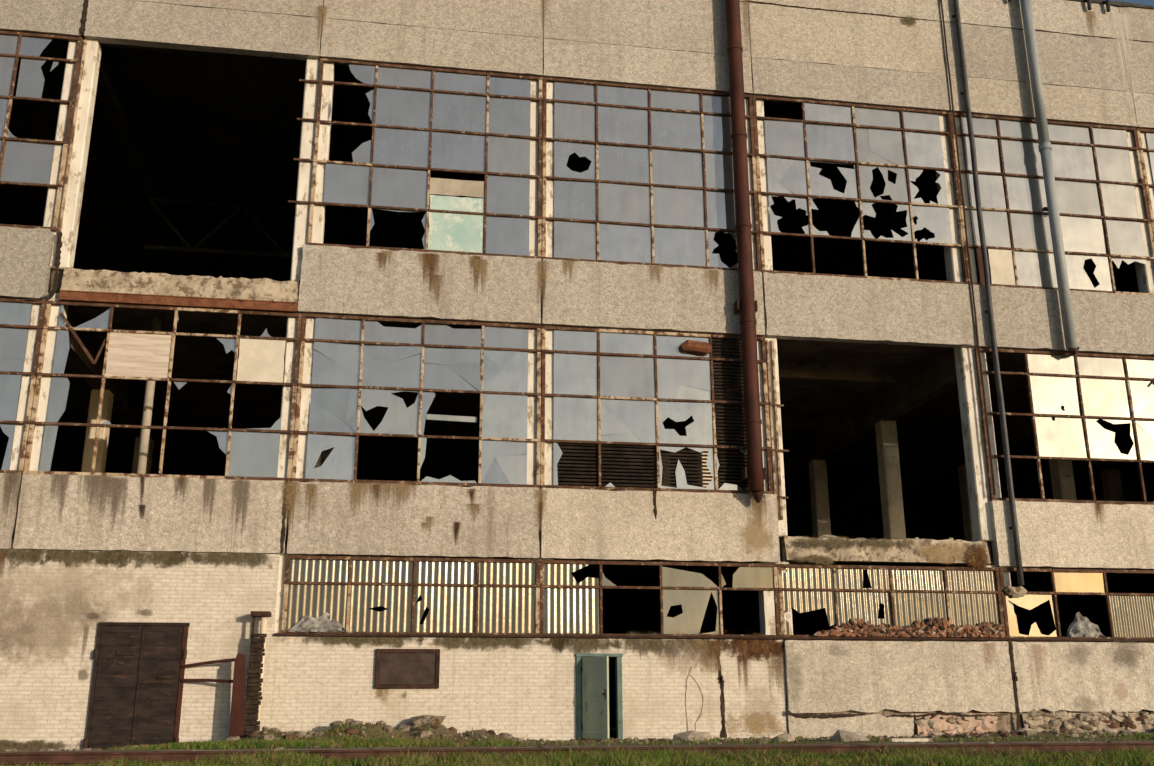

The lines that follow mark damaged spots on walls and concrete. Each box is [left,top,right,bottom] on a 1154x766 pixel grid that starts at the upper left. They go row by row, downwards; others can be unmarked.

spalling [60,267,300,302]
corrosion [419,253,442,303]
corrosion [471,256,487,288]
corrosion [4,472,20,507]
corrosion [283,481,316,524]
corrosion [351,483,416,509]
corrosion [468,489,480,518]
spalling [782,535,991,564]
crack [685,640,727,738]
leakage [728,713,777,734]
spalling [914,713,998,736]
spalling [1022,709,1154,734]